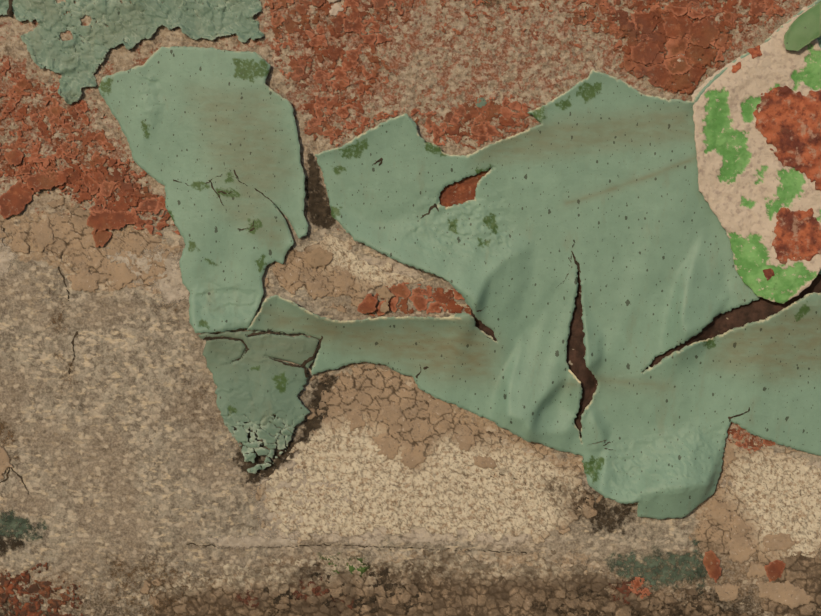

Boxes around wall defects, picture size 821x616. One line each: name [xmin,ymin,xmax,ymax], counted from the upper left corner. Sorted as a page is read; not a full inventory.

peeling [438,0,531,34]
peeling [656,5,694,39]
peeling [664,0,786,48]
peeling [630,41,660,65]
peeling [278,54,313,89]
peeling [0,0,264,219]
peeling [87,201,135,247]
peeling [357,285,395,316]
crack [203,329,286,361]
crack [140,336,821,616]
flaking render [473,456,497,469]
peeling [0,562,87,616]